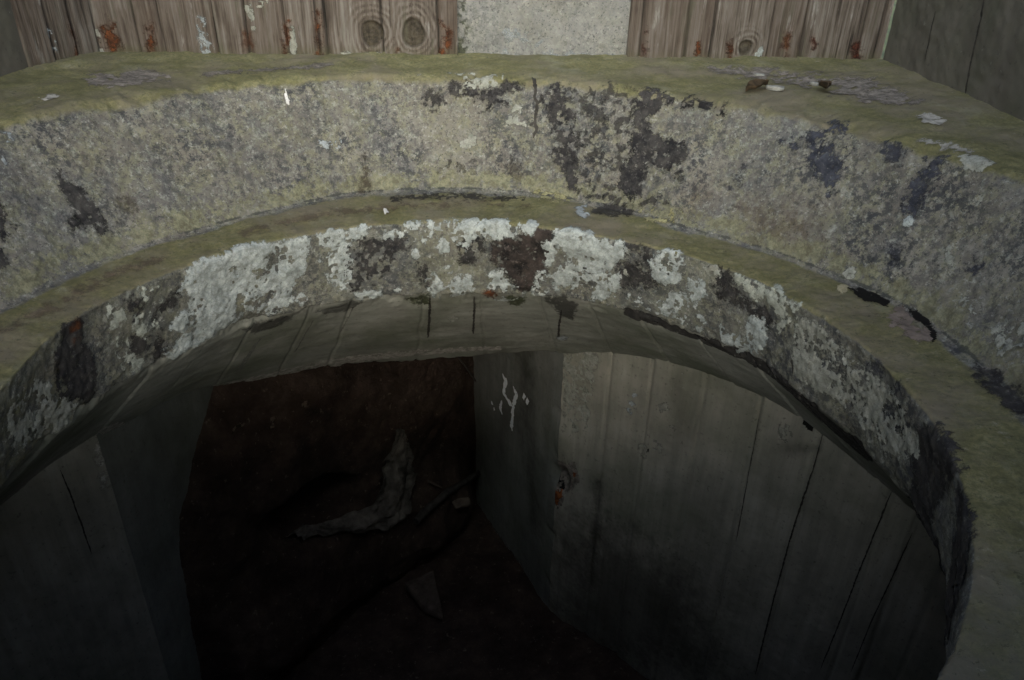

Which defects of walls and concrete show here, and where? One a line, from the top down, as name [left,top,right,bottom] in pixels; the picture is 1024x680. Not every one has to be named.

corrosion [97,23,121,52]
damp [421,78,525,114]
damp [541,81,728,217]
damp [778,118,856,199]
damp [55,164,108,237]
damp [405,261,430,305]
damp [454,228,579,321]
crack [425,297,433,338]
crack [470,297,478,334]
crack [555,311,563,337]
damp [53,316,98,405]